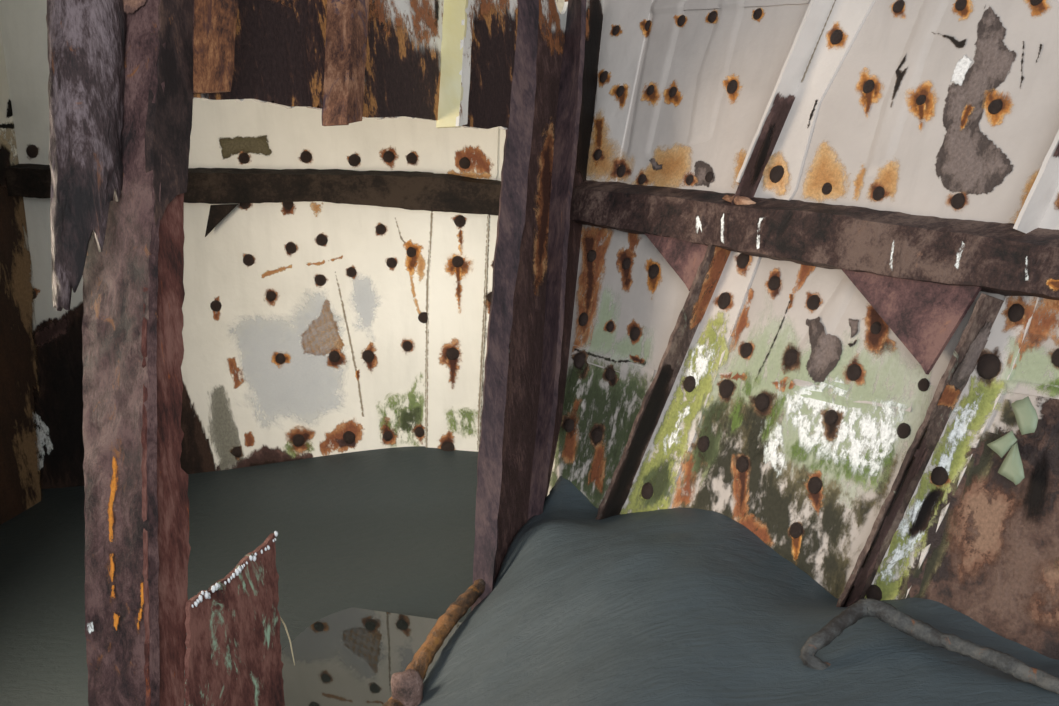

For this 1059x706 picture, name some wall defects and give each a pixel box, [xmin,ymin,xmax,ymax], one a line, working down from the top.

rust [123,0,327,225]
rust [448,146,491,179]
rust [462,0,519,129]
rust [731,92,795,205]
rust [803,142,899,202]
rust [856,68,881,116]
peeling [931,5,1016,195]
peeling [301,300,344,356]
rust [494,0,565,582]
rust [545,0,698,498]
rust [977,279,1059,385]
rust [588,364,700,520]